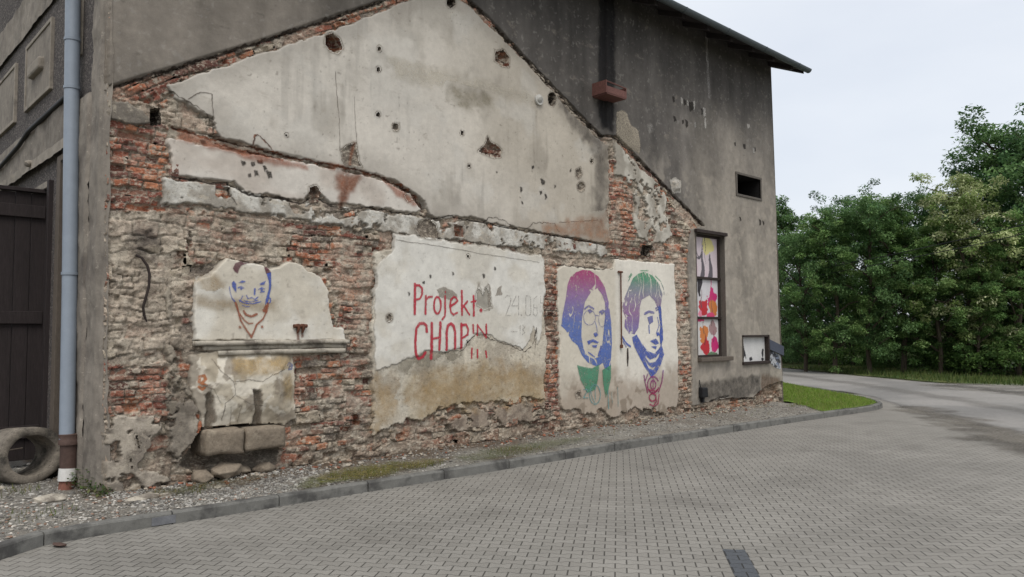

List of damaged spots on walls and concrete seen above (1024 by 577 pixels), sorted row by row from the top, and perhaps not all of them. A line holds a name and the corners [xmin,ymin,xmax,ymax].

spalling [112,0,407,108]
spalling [494,49,510,68]
spalling [672,97,706,128]
rust [329,165,363,204]
spalling [103,122,561,473]
spalling [606,111,782,414]